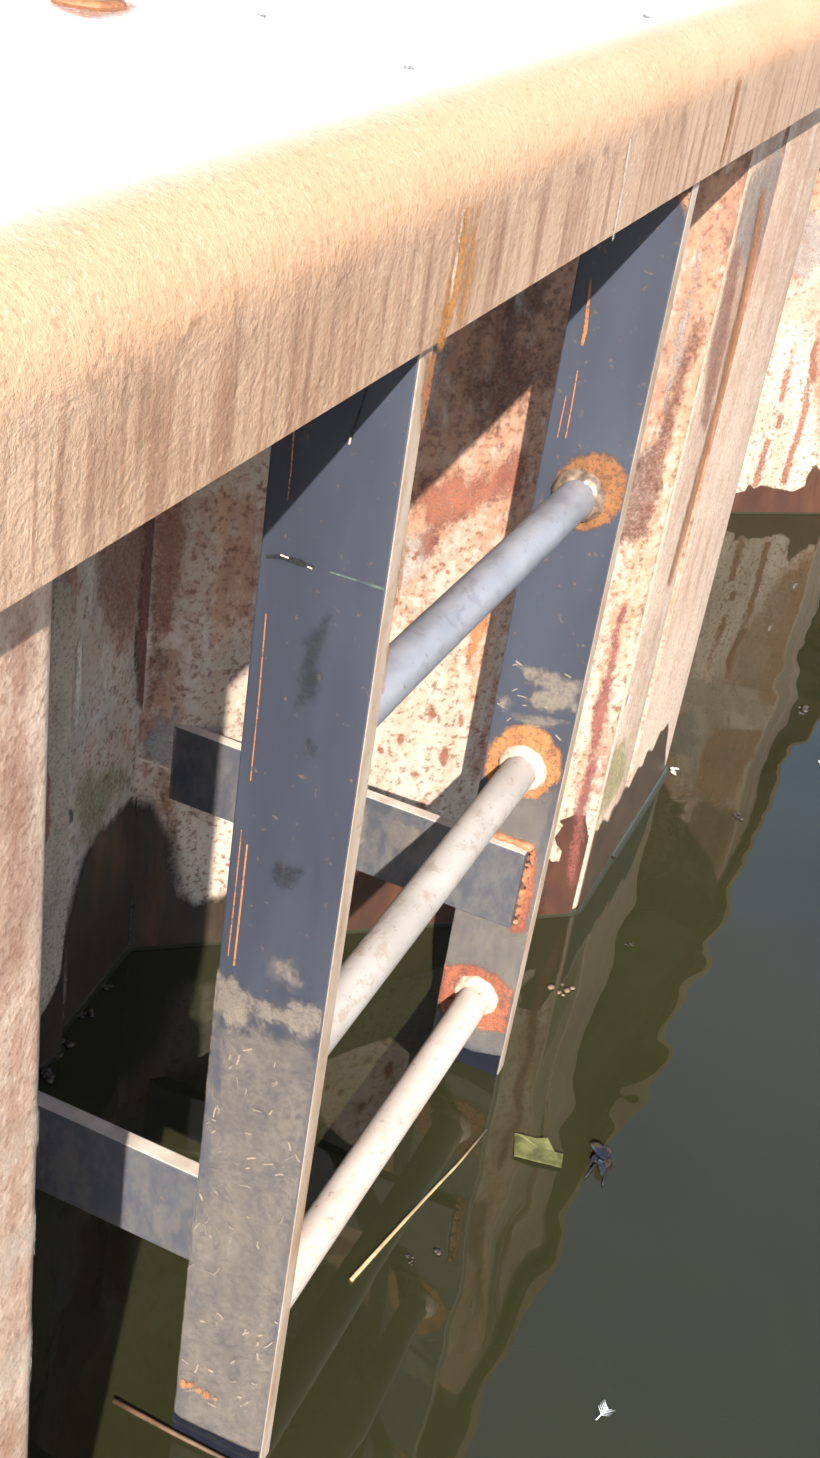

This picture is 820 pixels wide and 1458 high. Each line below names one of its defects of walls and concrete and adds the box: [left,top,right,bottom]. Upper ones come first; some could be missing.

rust [47,1,135,17]
rust [421,207,480,429]
rust [459,286,568,431]
rust [669,192,766,587]
rust [753,341,819,486]
rust [96,499,186,707]
rust [484,723,561,799]
rust [567,606,627,888]
rust [438,964,513,1033]